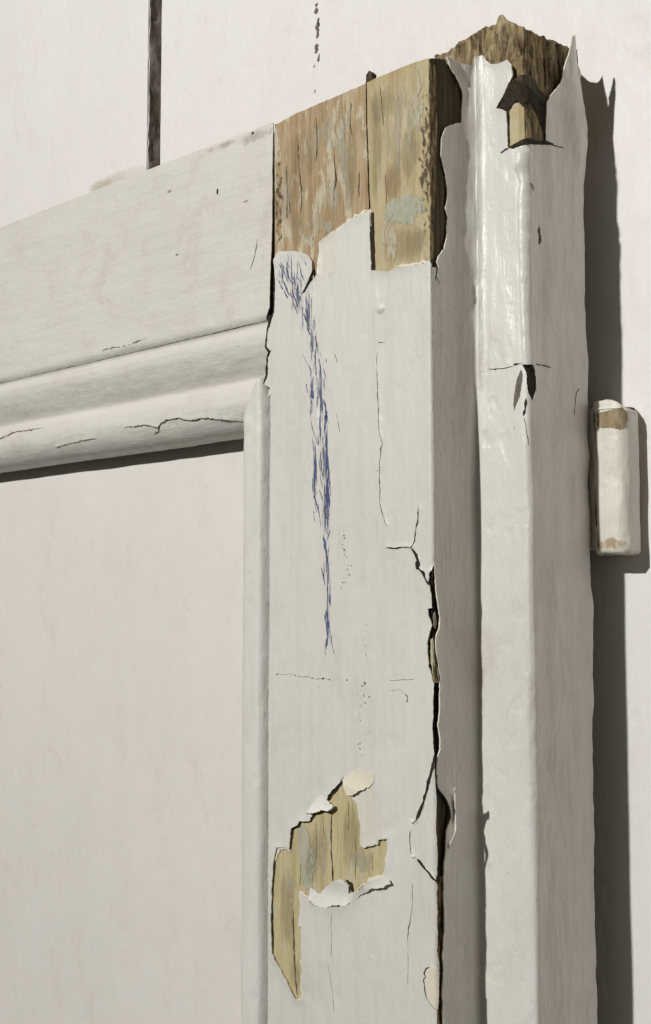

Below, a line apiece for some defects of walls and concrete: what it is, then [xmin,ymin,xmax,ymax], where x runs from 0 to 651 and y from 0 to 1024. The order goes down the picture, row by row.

peeling [273,58,462,294]
peeling [498,75,563,153]
crack [0,428,94,448]
crack [125,417,243,434]
crack [376,342,443,1024]
peeling [271,630,391,1001]